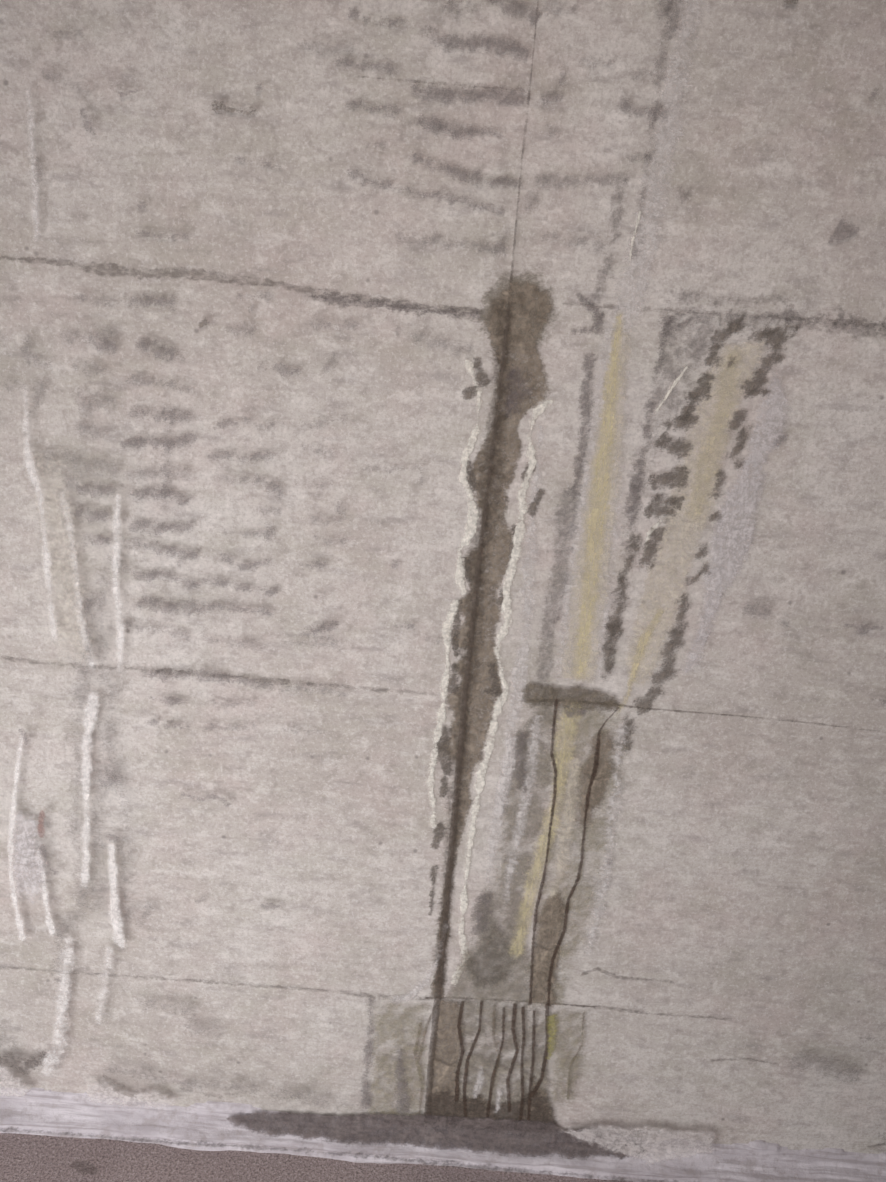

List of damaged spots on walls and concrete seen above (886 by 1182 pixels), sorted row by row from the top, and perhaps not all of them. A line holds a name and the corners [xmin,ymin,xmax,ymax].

crack [424,271,513,1116]
water stain [227,0,799,1160]